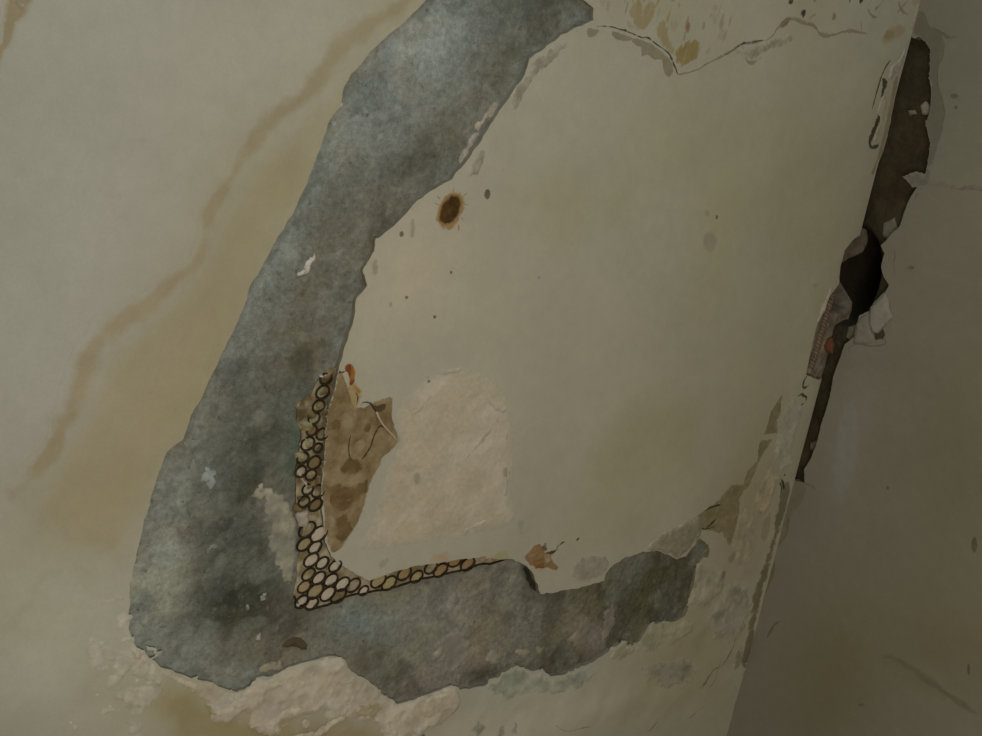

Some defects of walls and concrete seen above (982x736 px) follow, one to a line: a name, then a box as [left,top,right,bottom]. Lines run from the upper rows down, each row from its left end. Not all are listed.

water stain [0,0,417,580]
corrosion [434,187,468,231]
flaking render [128,0,782,736]
crack [587,0,909,175]
flaking render [779,37,931,493]